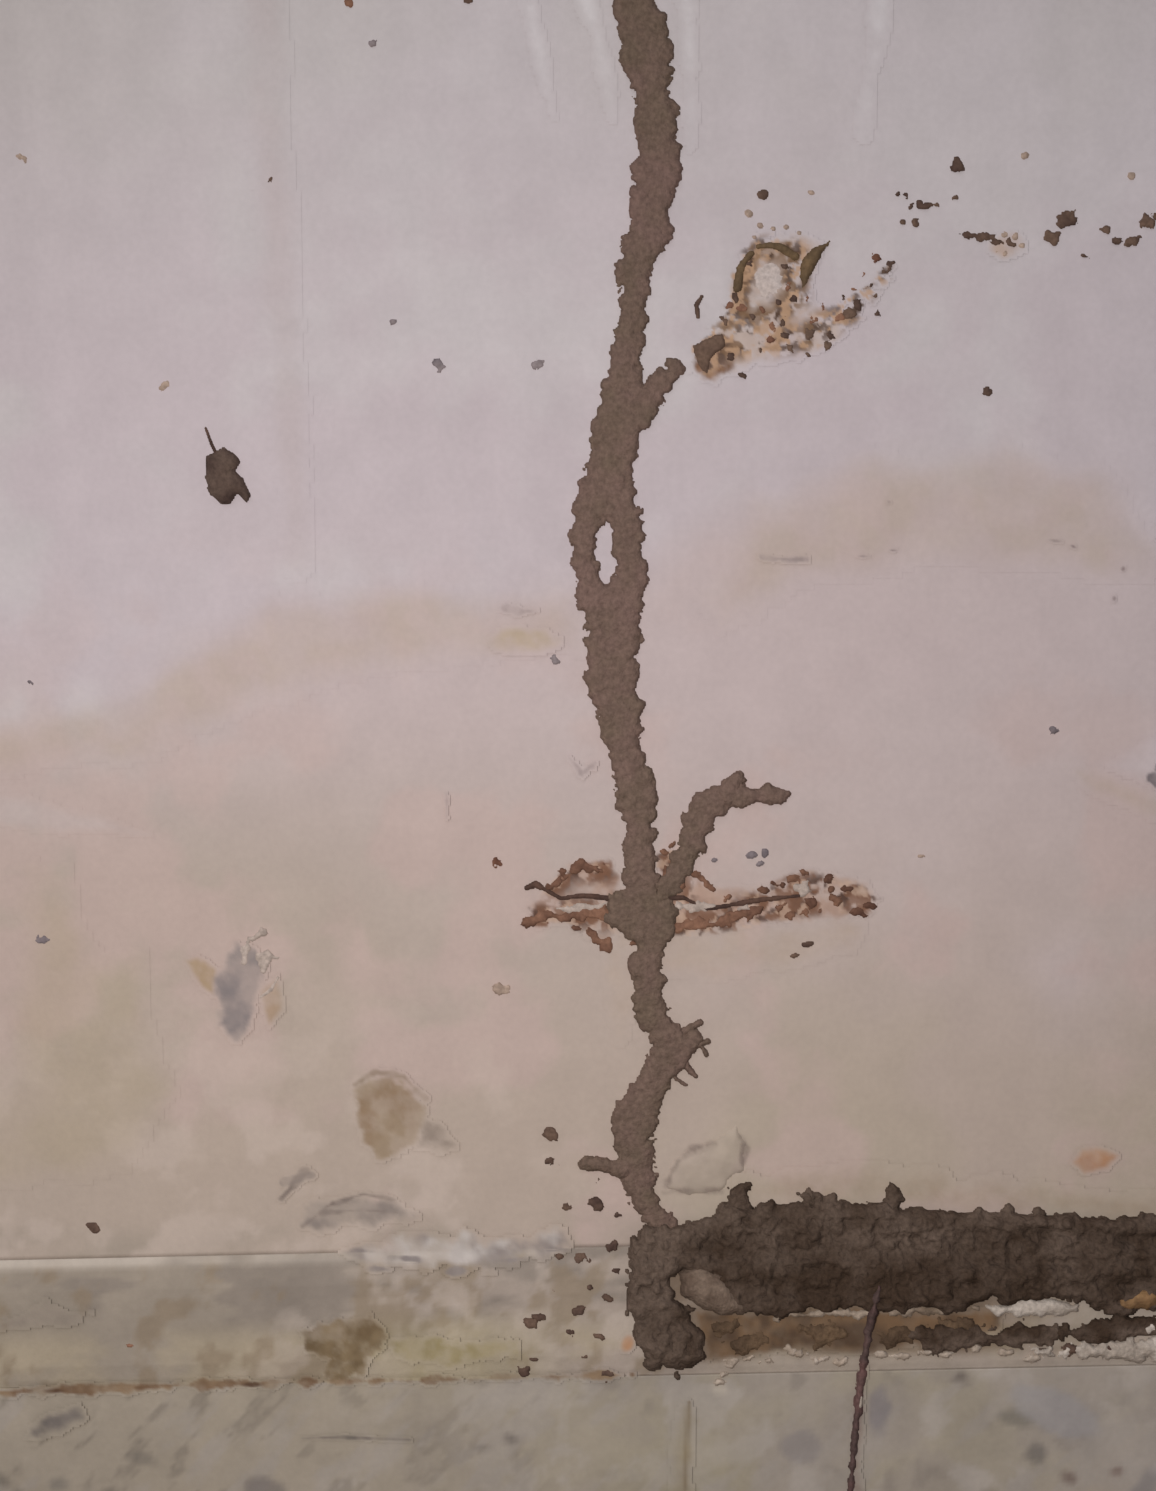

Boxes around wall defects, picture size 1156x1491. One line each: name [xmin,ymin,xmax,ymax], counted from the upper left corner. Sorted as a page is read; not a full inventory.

peeling [687,189,898,387]